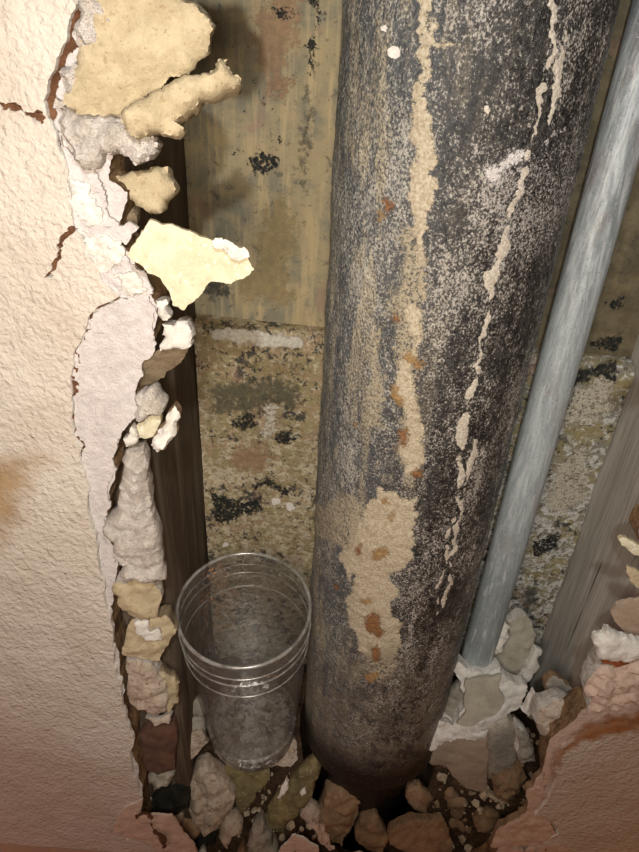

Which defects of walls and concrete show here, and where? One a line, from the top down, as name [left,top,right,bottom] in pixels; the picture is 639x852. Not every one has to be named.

crack [0,8,81,146]
crack [45,226,77,277]
water stain [203,282,230,298]
flaking render [54,98,167,584]
water stain [209,327,303,348]
water stain [315,0,461,682]
water stain [564,336,622,428]
water stain [211,403,296,525]
rust [372,546,390,560]
flaking render [617,529,639,556]
flaking render [520,687,535,716]
flaking render [580,645,639,714]